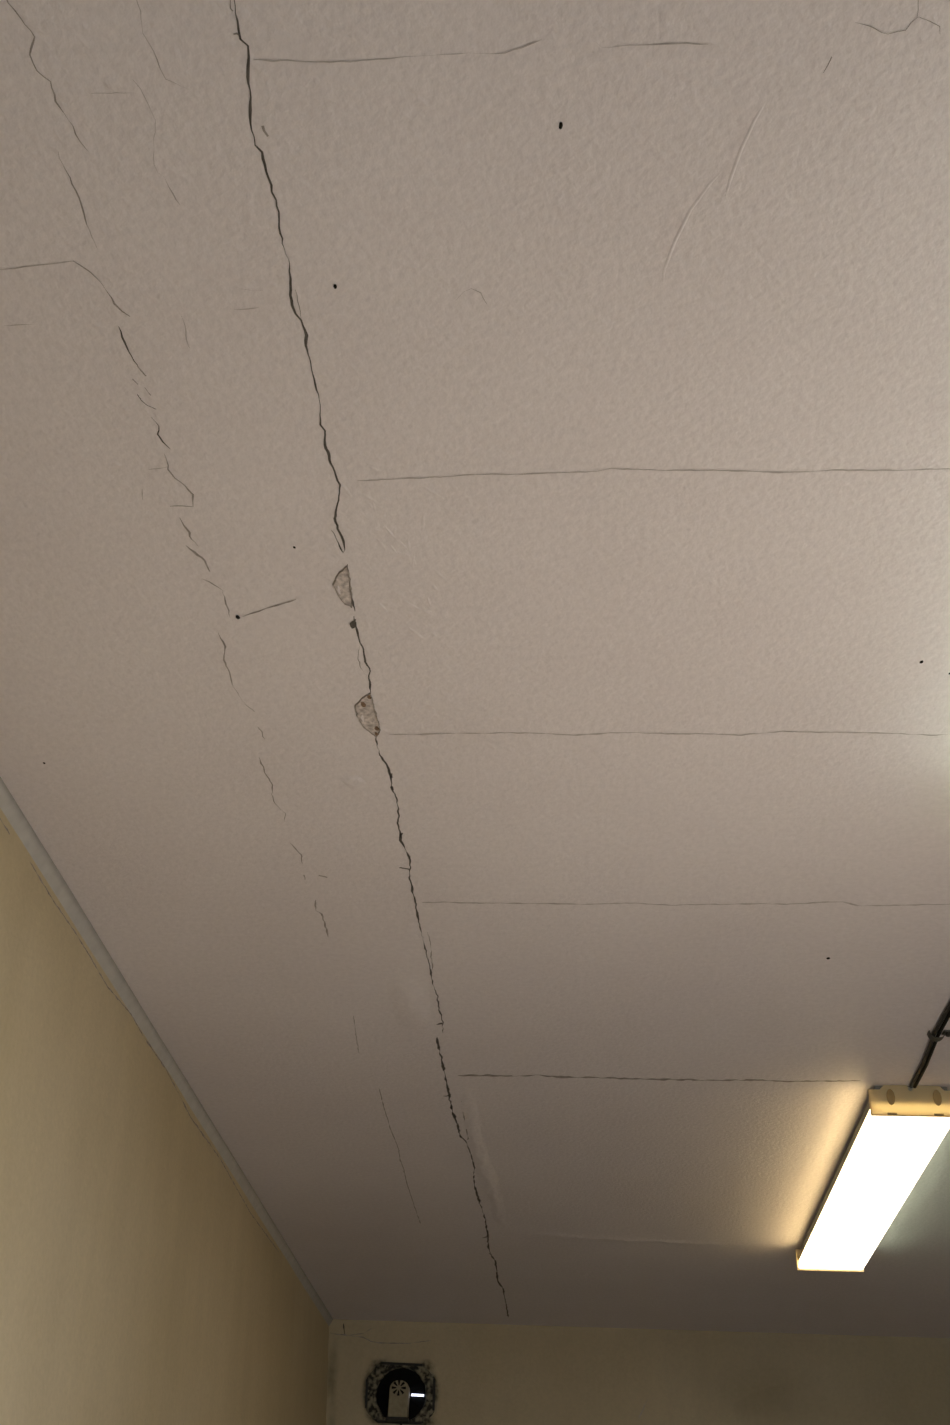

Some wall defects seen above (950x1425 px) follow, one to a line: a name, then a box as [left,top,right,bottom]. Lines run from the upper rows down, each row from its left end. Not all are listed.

crack [0,0,328,936]
spalling [333,565,356,629]
spalling [355,693,380,737]
crack [230,0,950,1317]